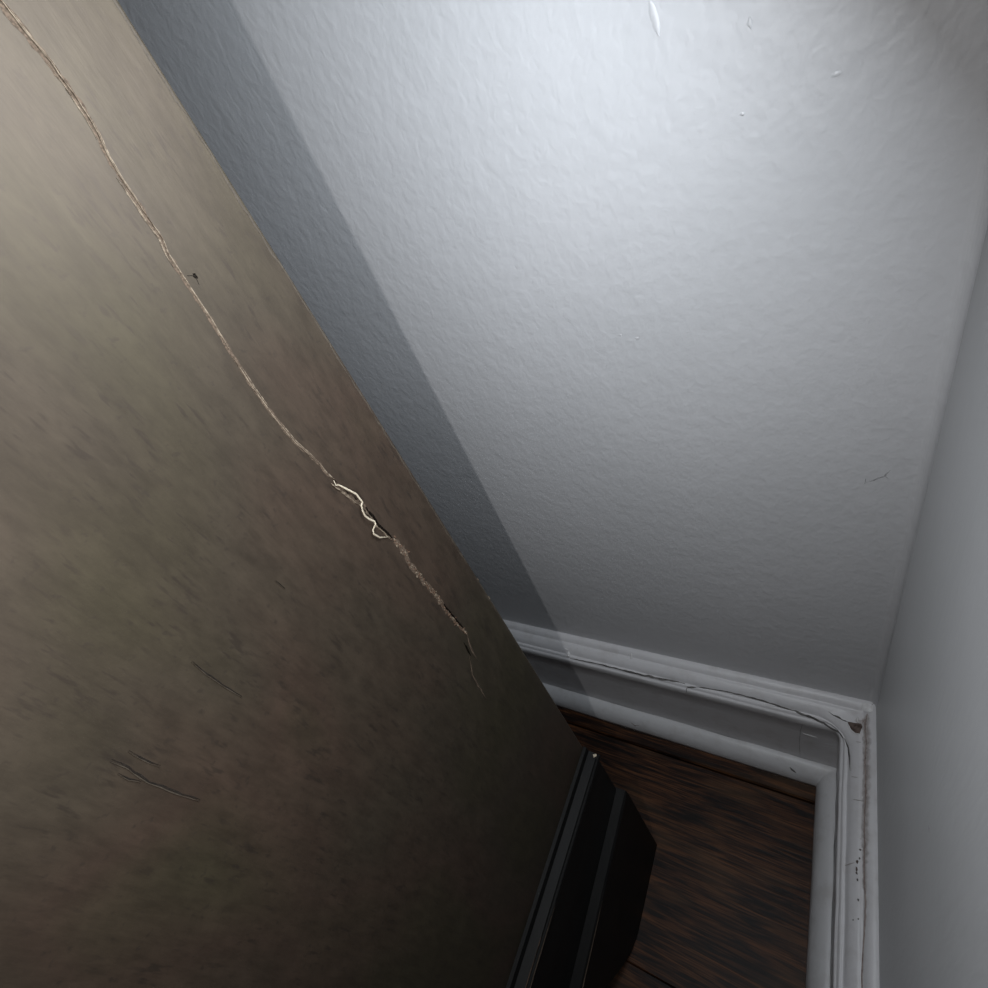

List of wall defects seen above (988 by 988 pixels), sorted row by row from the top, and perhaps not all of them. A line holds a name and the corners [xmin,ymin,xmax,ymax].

crack [0,0,487,699]
crack [570,658,867,988]